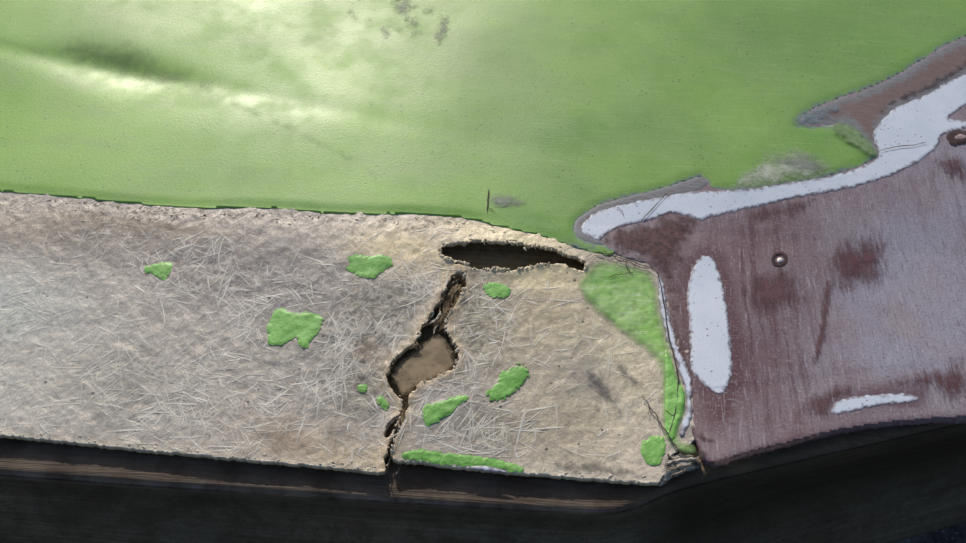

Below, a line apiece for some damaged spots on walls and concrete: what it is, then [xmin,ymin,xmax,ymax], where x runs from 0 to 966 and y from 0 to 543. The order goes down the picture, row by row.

crack [384,267,466,472]